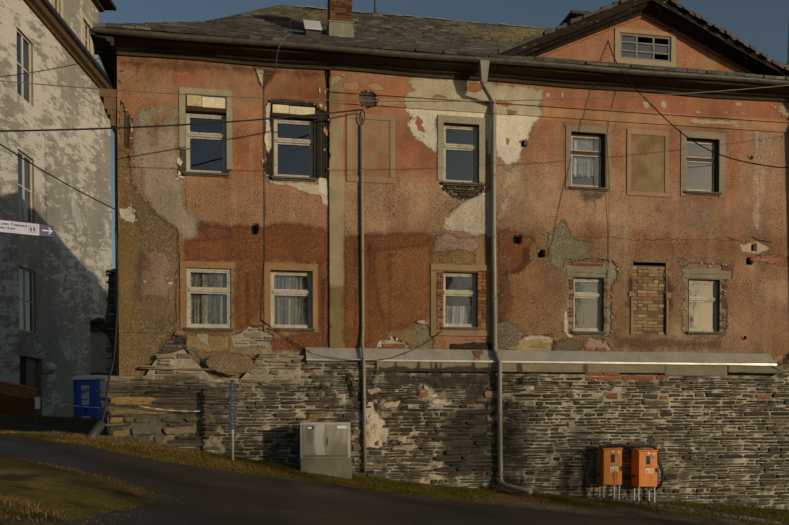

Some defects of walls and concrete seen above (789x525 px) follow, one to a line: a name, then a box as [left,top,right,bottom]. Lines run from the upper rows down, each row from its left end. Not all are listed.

spalling [255,68,273,88]
flaking render [117,100,198,246]
flaking render [261,71,564,237]
spalling [156,325,274,364]
spalling [376,337,413,349]
spalling [508,333,554,351]
spalling [563,258,620,351]
spalling [681,262,734,339]